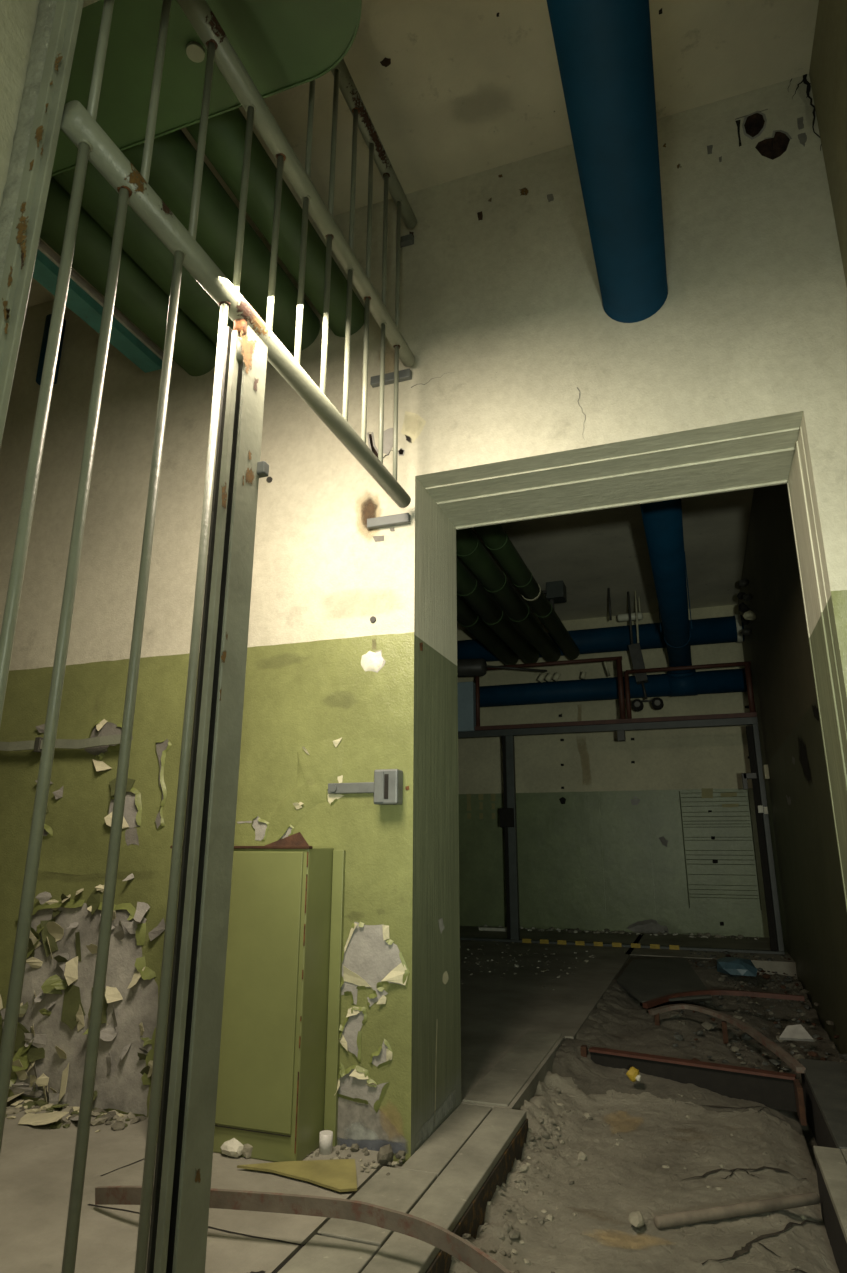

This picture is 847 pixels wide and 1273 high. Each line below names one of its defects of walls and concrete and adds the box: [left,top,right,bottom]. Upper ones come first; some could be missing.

spalling [735,109,768,147]
crack [788,74,822,151]
corrosion [124,162,148,195]
corrosion [2,202,29,334]
corrosion [236,295,271,391]
corrosion [362,499,377,530]
peeling [0,884,165,1117]
peeling [334,922,410,1113]
crack [683,1166,807,1180]
crack [702,1220,819,1273]